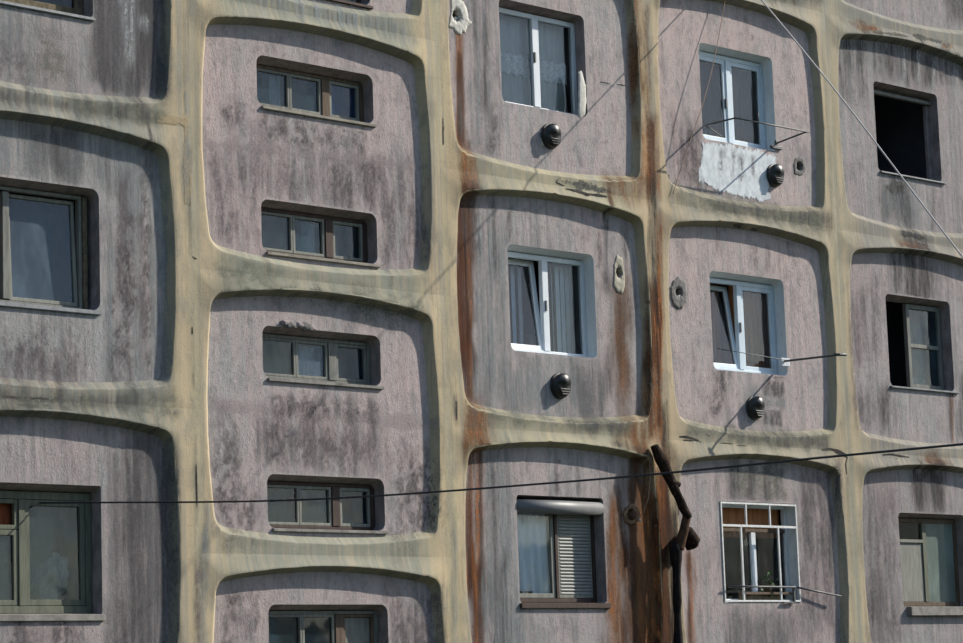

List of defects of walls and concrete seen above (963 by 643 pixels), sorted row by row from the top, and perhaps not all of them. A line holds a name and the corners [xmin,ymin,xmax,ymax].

leakage [62,0,168,122]
corrosion [628,13,648,103]
spalling [556,178,608,194]
peeling [698,141,776,202]
corrosion [456,34,488,643]
corrosion [603,115,679,643]
leakage [107,440,180,643]